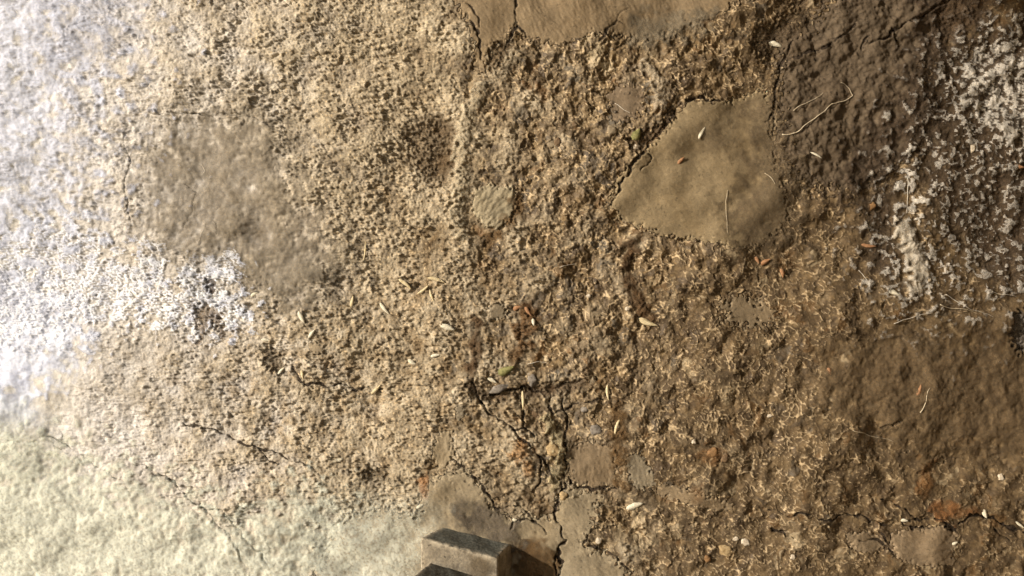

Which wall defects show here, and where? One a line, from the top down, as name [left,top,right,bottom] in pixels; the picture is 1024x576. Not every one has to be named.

spalling [488,42,510,72]
spalling [628,110,675,153]
leakage [834,0,1024,296]
leakage [0,102,337,426]
crack [9,434,268,564]
crack [183,423,322,478]
spalling [471,377,585,409]
crack [455,381,632,576]